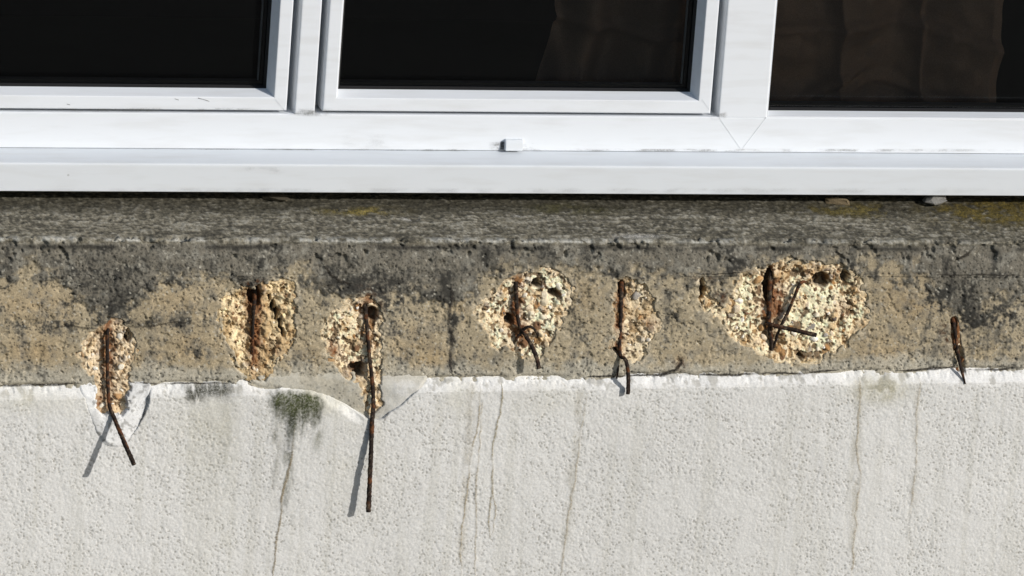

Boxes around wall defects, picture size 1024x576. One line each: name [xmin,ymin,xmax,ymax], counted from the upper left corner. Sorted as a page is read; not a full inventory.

spalling [75,317,152,466]
spalling [216,277,427,512]
spalling [473,267,575,369]
spalling [608,276,662,394]
spalling [697,255,870,366]